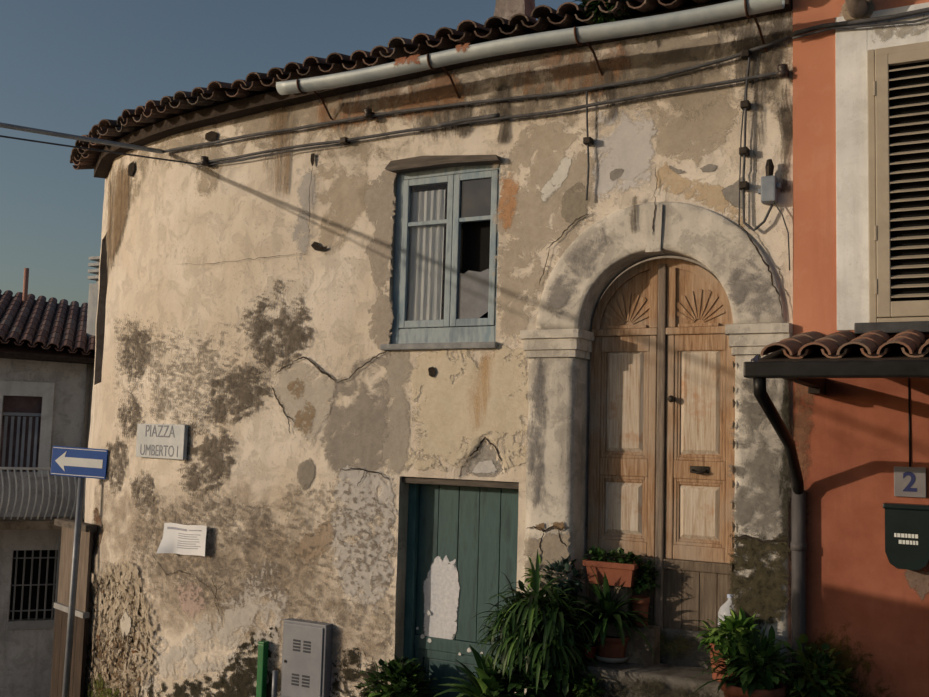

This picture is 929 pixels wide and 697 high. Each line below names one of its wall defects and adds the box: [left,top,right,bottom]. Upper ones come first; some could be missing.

water stain [107,166,130,264]
peeling [106,125,223,277]
peeling [232,32,744,349]
crack [539,214,589,285]
crack [738,222,783,317]
crack [271,350,388,433]
water stain [106,280,396,697]
peeling [292,465,397,614]
water stain [729,379,813,630]